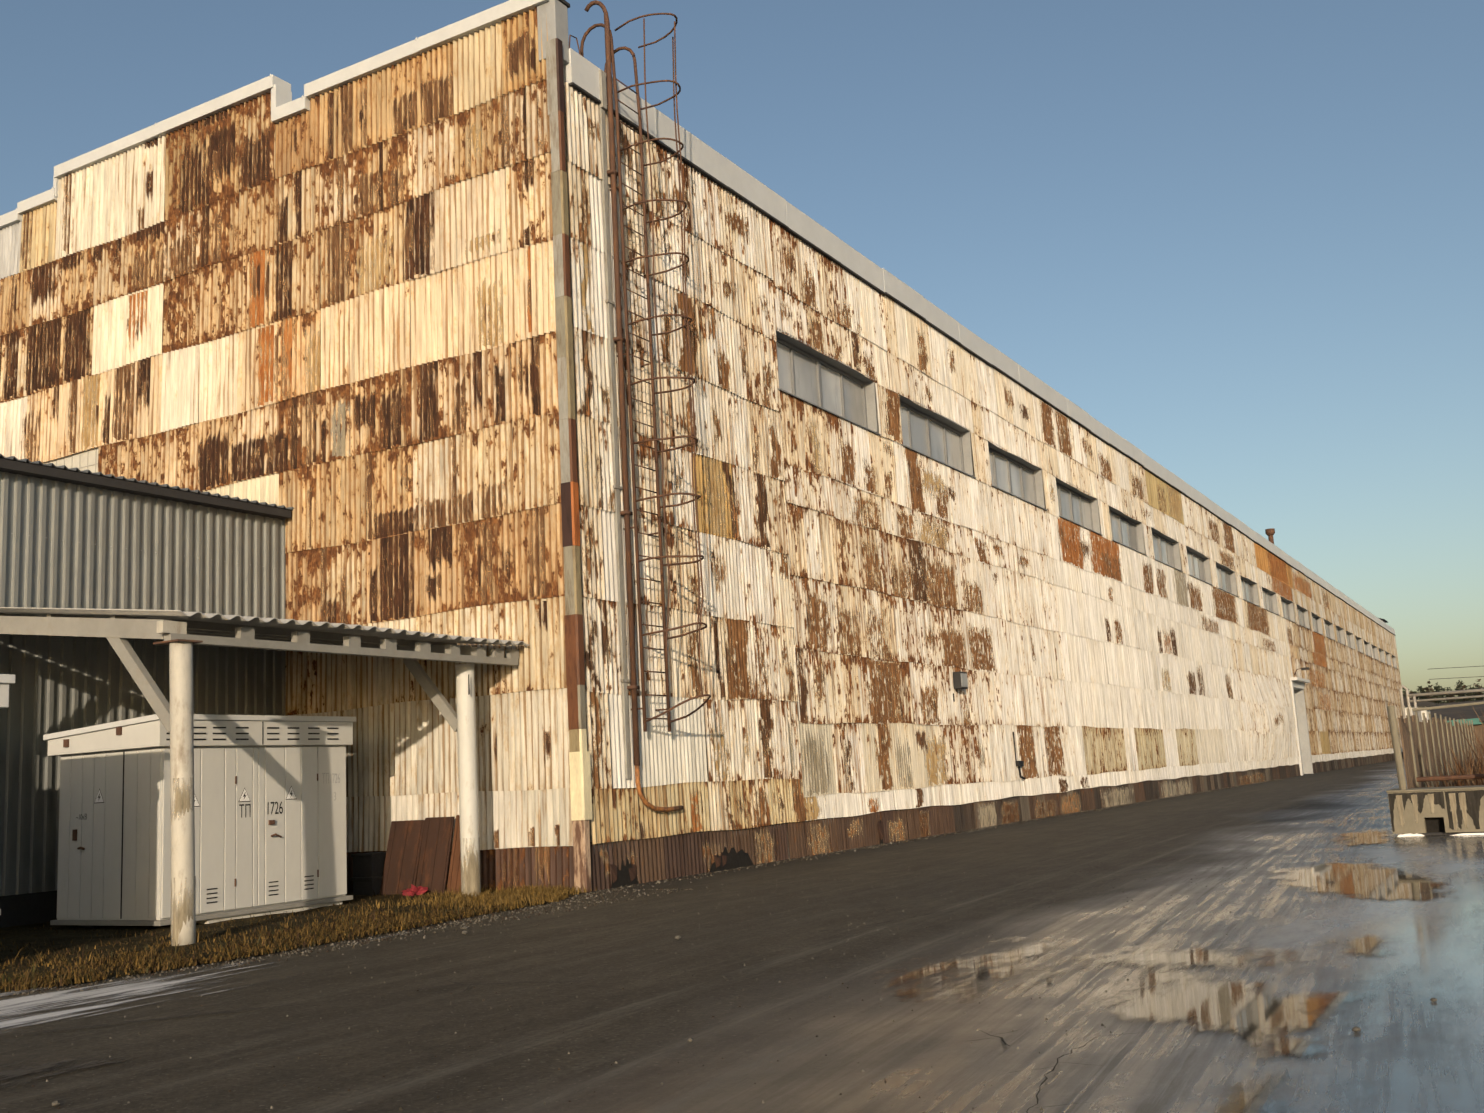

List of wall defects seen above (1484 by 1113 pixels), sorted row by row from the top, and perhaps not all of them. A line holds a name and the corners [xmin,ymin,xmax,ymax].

rust [0,110,270,462]
rust [197,170,326,492]
rust [326,72,454,306]
rust [354,226,547,632]
rust [469,30,542,197]
rust [580,185,611,423]
rust [583,526,627,788]
rust [654,174,1029,872]
rust [1000,725,1090,824]
rust [1004,386,1112,482]
rust [1049,485,1122,602]
damp [1388,790,1484,832]